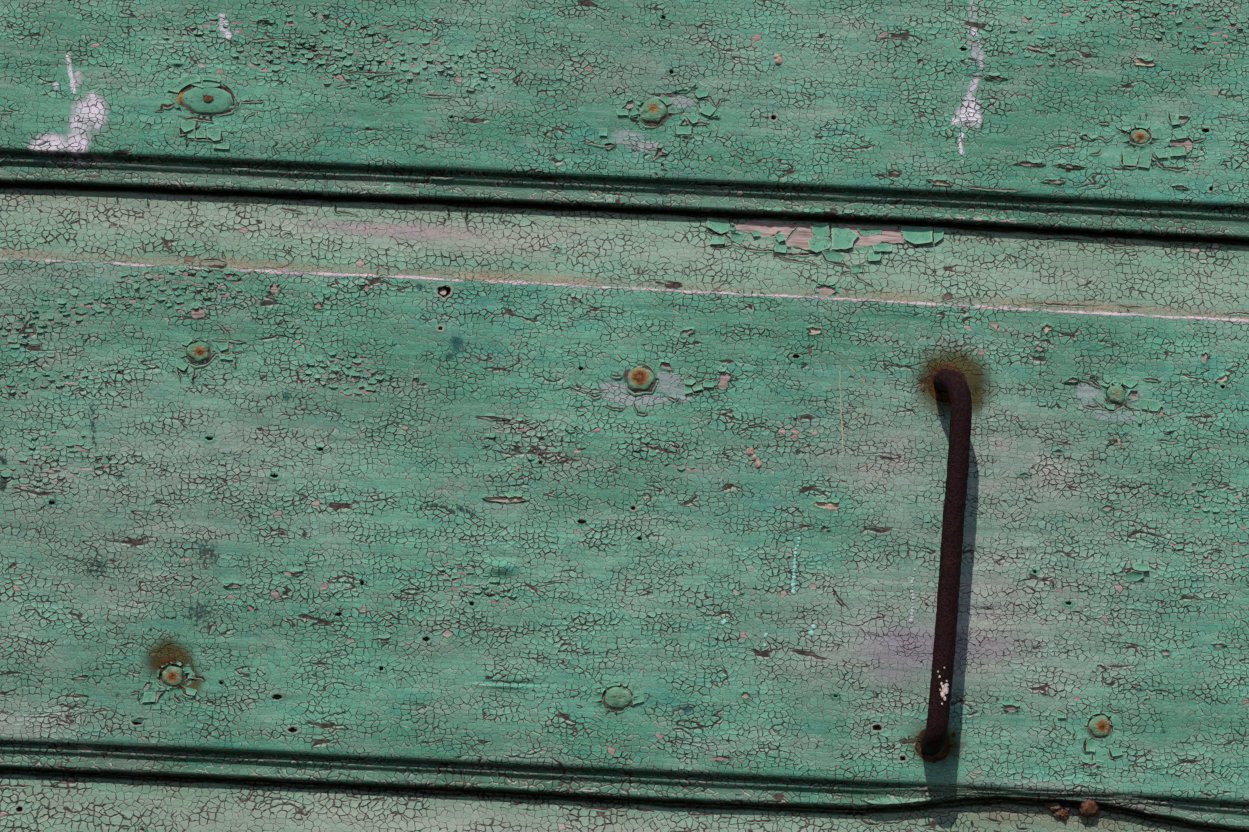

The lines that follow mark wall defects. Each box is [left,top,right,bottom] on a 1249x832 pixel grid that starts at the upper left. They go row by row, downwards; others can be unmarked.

crack [248,38,455,99]
crack [83,166,363,218]
crack [417,174,521,222]
crack [961,186,1077,205]
crack [201,258,228,272]
crack [656,280,683,288]
peeling [702,206,1026,302]
crack [1010,298,1142,313]
corrosion [921,353,985,410]
crack [832,587,865,633]
corrosion [149,645,199,691]
corrosion [915,728,956,763]